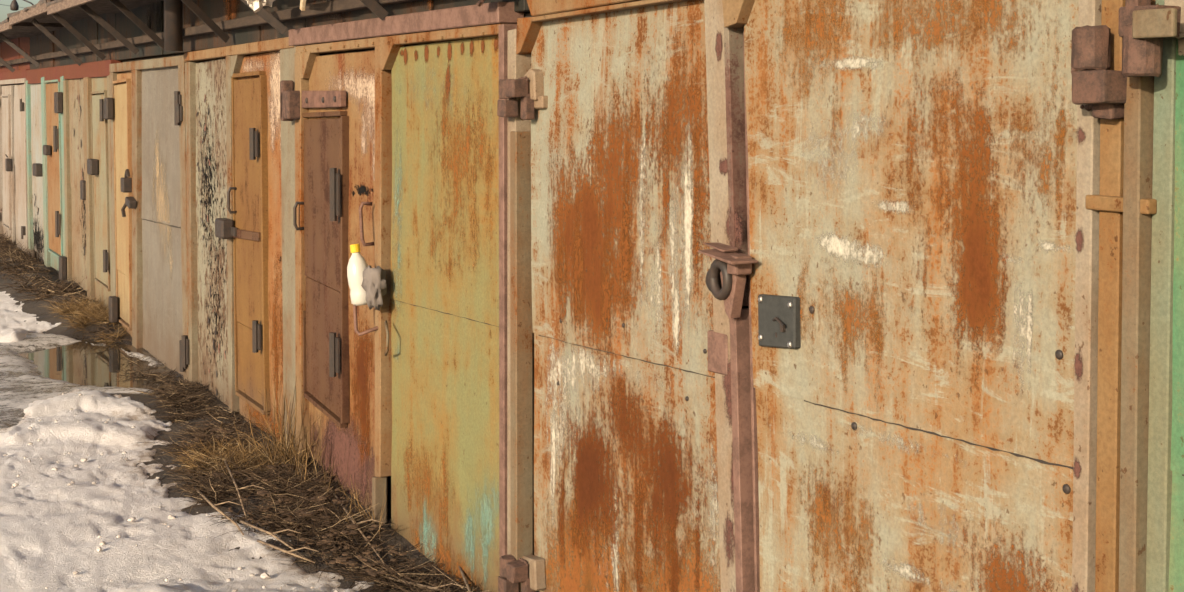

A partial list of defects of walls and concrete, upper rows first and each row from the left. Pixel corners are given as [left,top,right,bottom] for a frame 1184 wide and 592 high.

rust [778,0,1041,94]
rust [400,38,499,281]
rust [548,33,713,358]
rust [889,70,1086,381]
rust [309,319,375,504]
rust [405,441,483,591]
rust [545,370,721,592]
rust [798,467,878,592]
rust [962,520,1053,592]